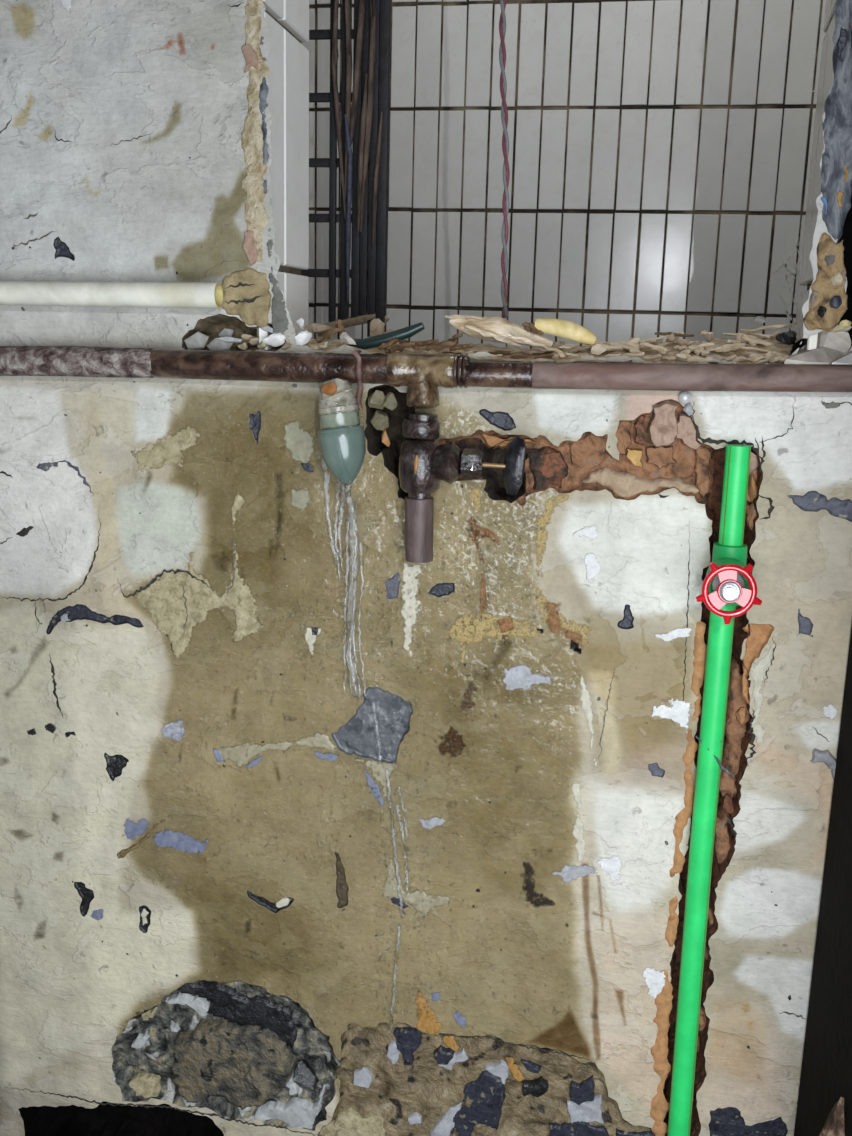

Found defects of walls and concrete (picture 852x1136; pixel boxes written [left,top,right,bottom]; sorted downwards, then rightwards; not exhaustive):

spalling [182,0,289,352]
peeling [791,0,852,355]
flaking render [438,399,713,506]
crack [3,460,101,624]
rust [468,488,499,612]
water stain [535,495,569,575]
water stain [447,589,592,663]
crack [27,655,75,737]
flaking render [651,621,707,878]
water stain [522,863,555,907]
spalling [19,965,673,1136]
spalling [709,1107,788,1136]